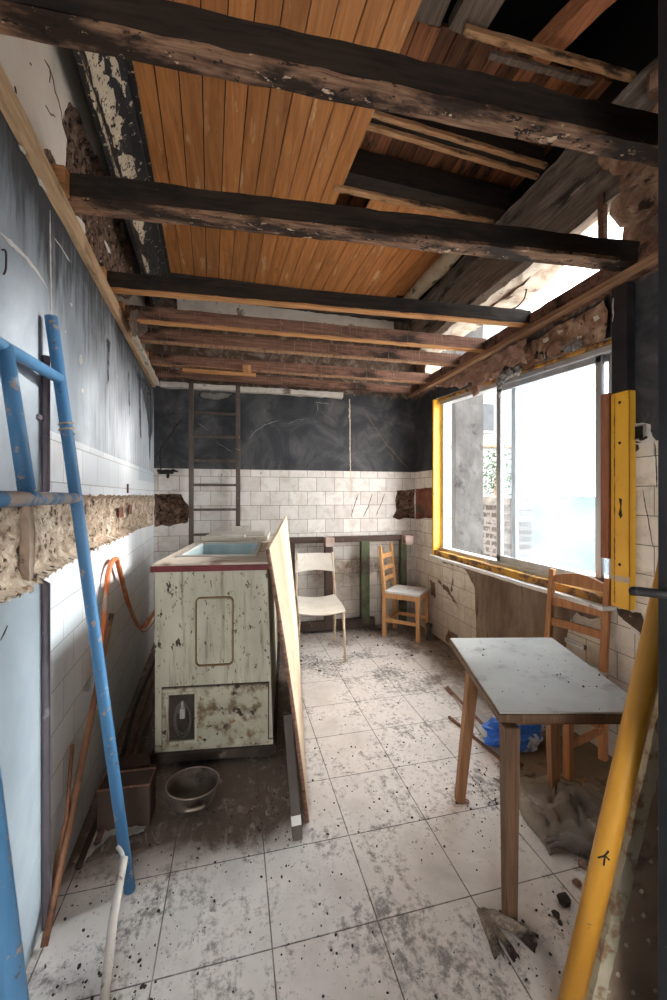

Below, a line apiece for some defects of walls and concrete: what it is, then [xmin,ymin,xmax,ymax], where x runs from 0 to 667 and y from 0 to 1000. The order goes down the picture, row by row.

peeling [44,51,137,179]
flaking render [75,214,150,274]
flaking render [470,262,548,306]
flaking render [435,321,467,335]
flaking render [518,298,614,370]
spalling [82,494,189,553]
spalling [393,488,432,520]
spalling [0,504,78,604]